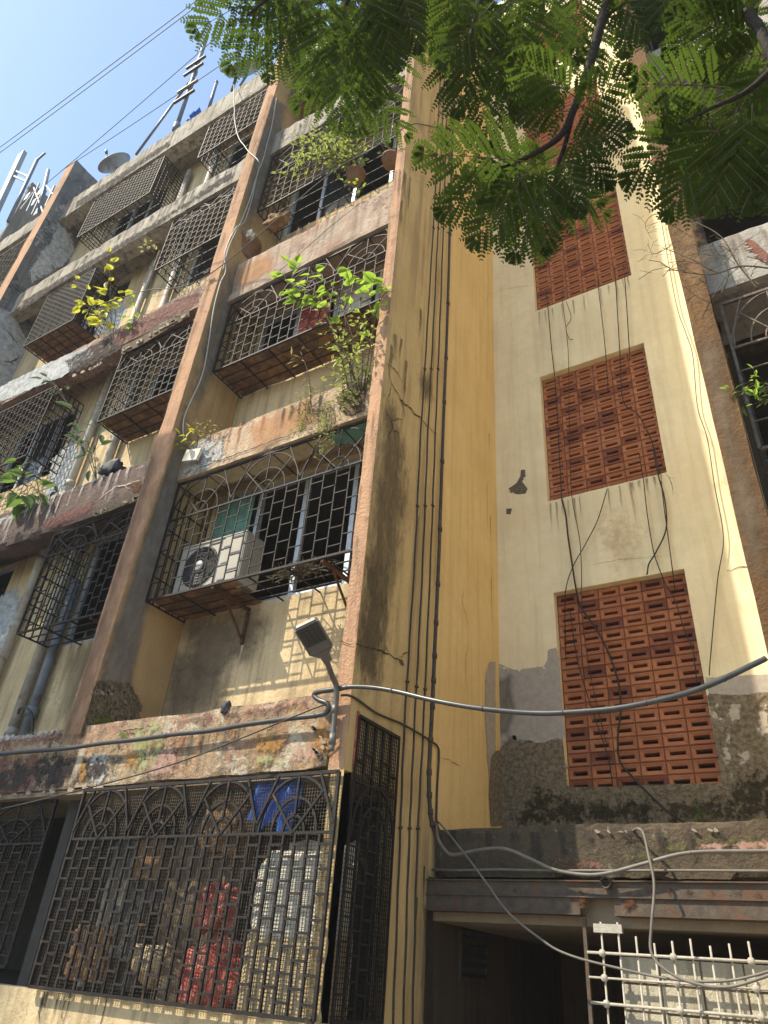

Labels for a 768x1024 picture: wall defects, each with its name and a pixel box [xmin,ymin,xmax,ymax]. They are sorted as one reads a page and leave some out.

peeling [29,217,75,284]
peeling [0,308,27,387]
crack [385,365,430,443]
water stain [358,408,406,680]
water stain [0,432,226,796]
crack [340,641,411,665]
peeling [489,674,768,849]